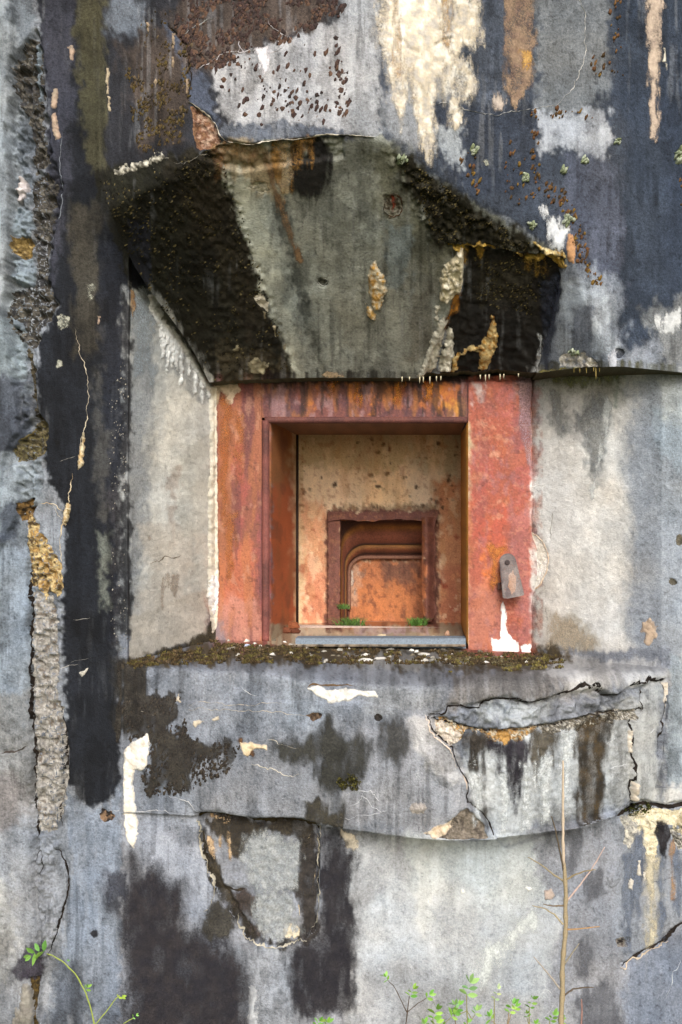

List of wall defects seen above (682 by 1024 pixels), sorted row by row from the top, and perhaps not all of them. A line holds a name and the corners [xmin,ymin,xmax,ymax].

efflorescence [113,152,169,176]
crack [37,329,89,561]
crack [1,569,70,954]
spalling [16,498,69,832]
peeling [99,733,151,848]
water stain [114,622,240,798]
water stain [106,713,409,1024]
corrosion [283,621,301,634]
corrosion [488,544,516,594]
spalling [619,781,682,860]
water stain [621,821,682,951]
crack [621,922,682,998]